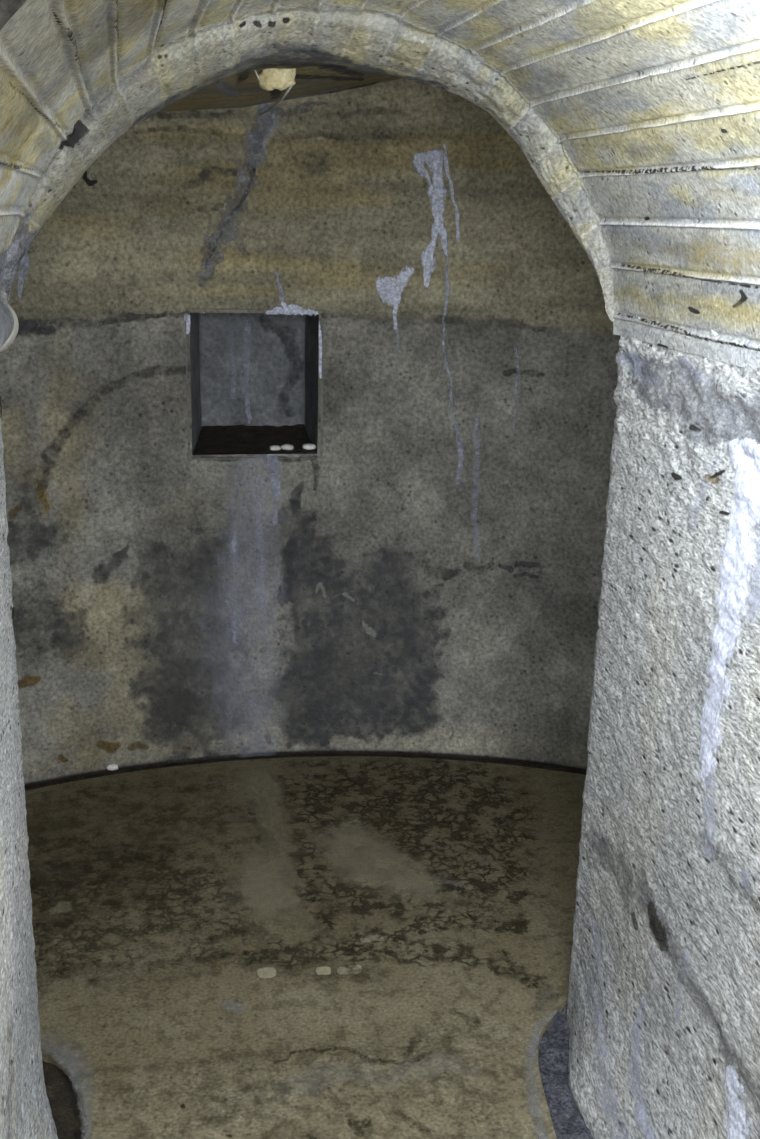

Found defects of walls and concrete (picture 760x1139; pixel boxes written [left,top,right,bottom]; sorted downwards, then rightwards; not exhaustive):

spalling [60,62,148,150]
crack [195,74,378,287]
efflorescence [376,144,460,345]
leakage [8,522,68,562]
leakage [12,599,85,651]
leakage [129,454,454,761]
leakage [618,352,760,788]
leakage [27,751,543,988]